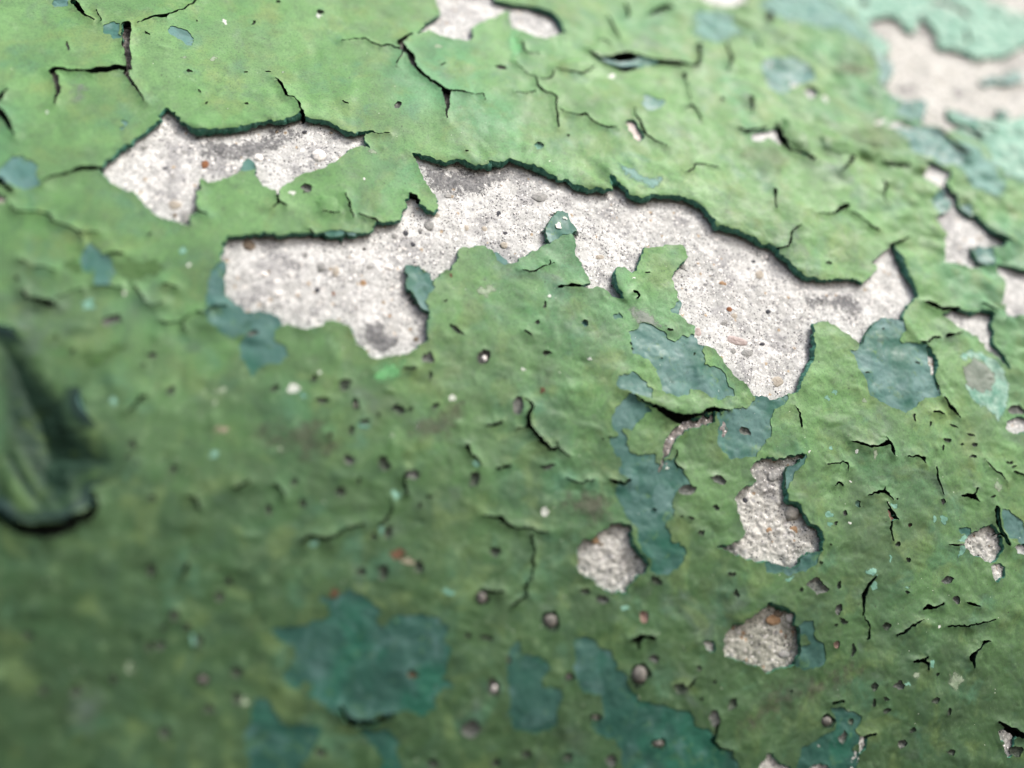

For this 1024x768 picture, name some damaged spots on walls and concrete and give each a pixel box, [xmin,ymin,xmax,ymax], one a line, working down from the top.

crack [48,0,196,104]
crack [342,32,486,118]
peeling [417,0,566,41]
crack [515,2,734,146]
peeling [100,107,374,226]
peeling [869,14,1024,369]
peeling [200,150,941,626]
crack [629,392,730,424]
crack [828,436,1024,546]
peeling [958,495,1024,583]
peeling [703,602,857,674]
crack [896,602,996,670]